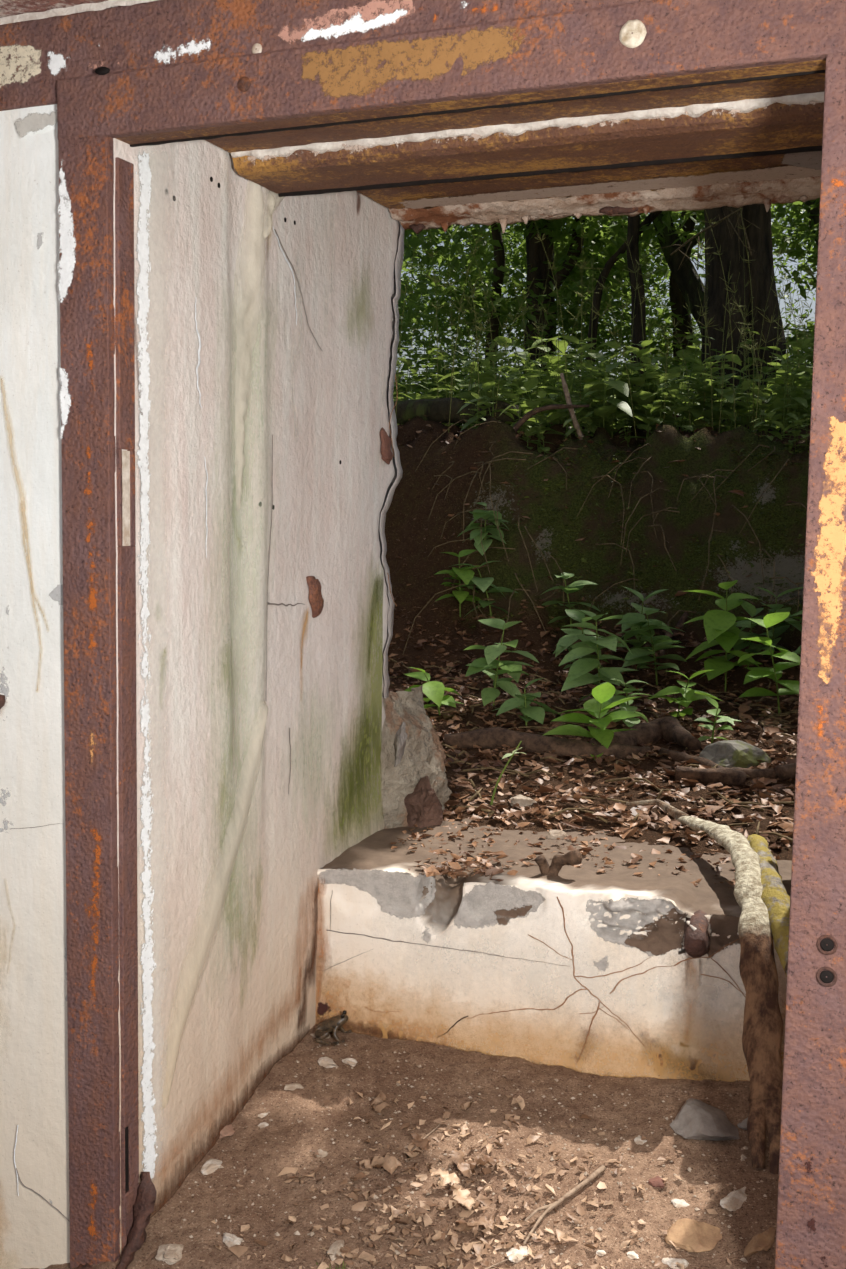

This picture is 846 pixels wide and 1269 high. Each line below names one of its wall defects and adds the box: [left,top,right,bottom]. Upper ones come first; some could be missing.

peeling [0,44,68,88]
peeling [277,0,525,98]
corrosion [84,447,97,649]
corrosion [811,416,846,684]
corrosion [85,827,102,1007]
spalling [454,881,545,928]
crack [323,890,746,1063]
spalling [586,898,688,971]
corrosion [88,1184,98,1239]